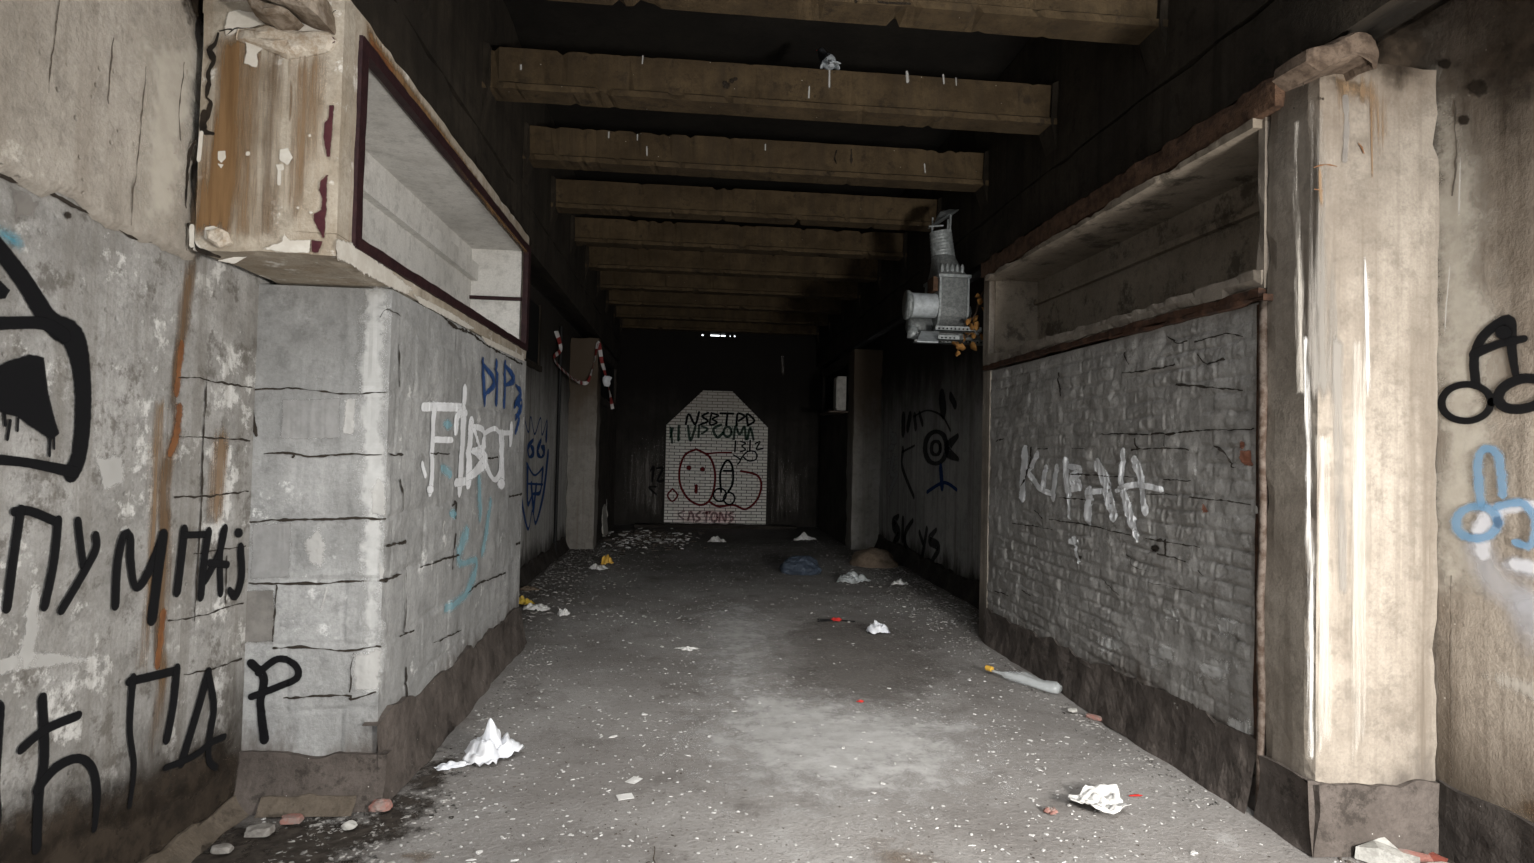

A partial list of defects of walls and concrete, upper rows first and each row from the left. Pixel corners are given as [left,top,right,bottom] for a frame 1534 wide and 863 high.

crack [49,0,60,82]
crack [0,28,232,258]
rust [196,39,322,232]
rust [142,263,195,723]
rust [210,433,228,520]